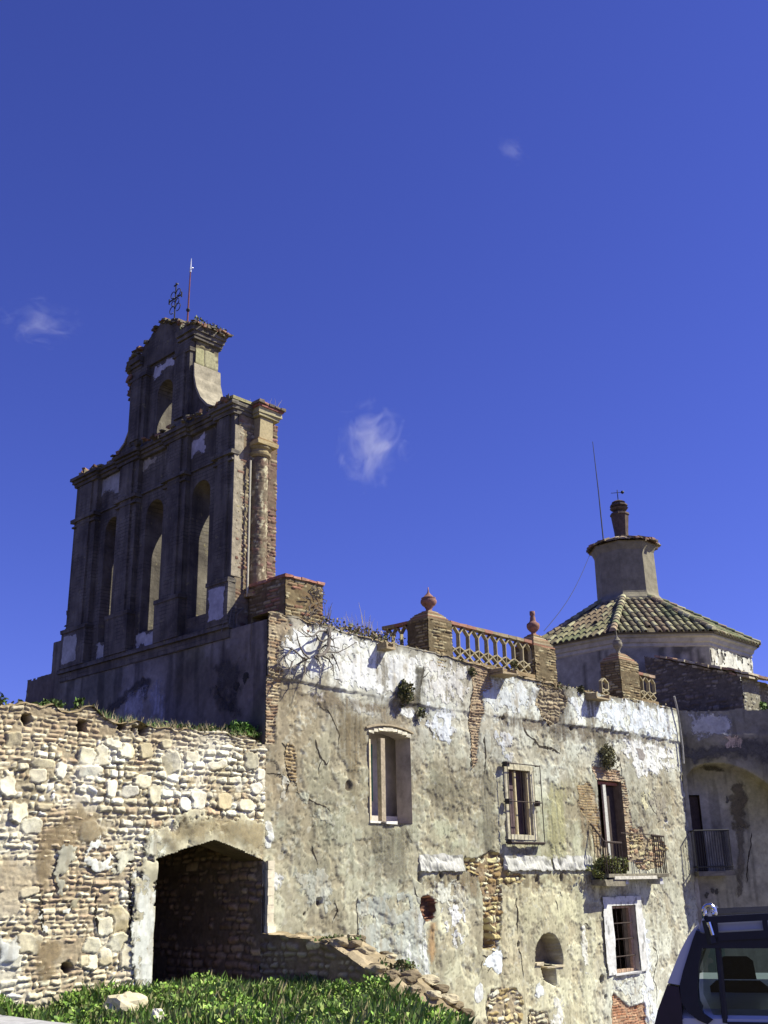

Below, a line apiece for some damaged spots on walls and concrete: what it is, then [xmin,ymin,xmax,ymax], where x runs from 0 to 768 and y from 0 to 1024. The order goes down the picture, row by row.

crack [267,704,340,810]
peeling [264,612,678,871]
water stain [726,783,750,896]
peeling [131,871,156,986]
spalling [420,852,525,974]
spalling [474,982,550,1024]
flaking render [611,918,658,1024]